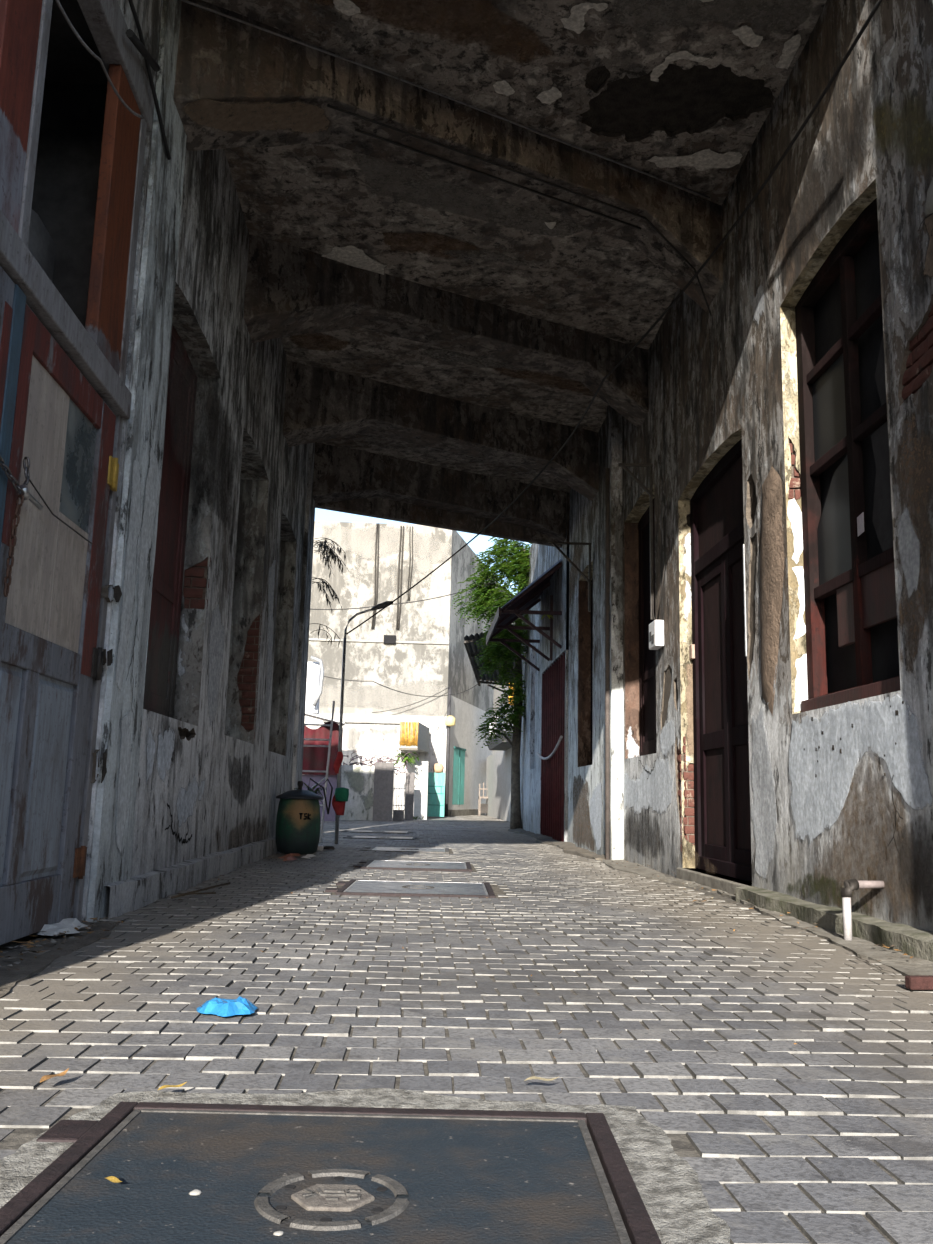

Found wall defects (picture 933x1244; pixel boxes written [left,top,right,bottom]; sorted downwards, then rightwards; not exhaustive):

spalling [582,51,773,139]
peeling [775,34,801,70]
peeling [647,149,743,171]
flaking render [898,305,933,672]
flaking render [237,560,276,739]
water stain [573,775,594,851]
water stain [815,758,933,921]